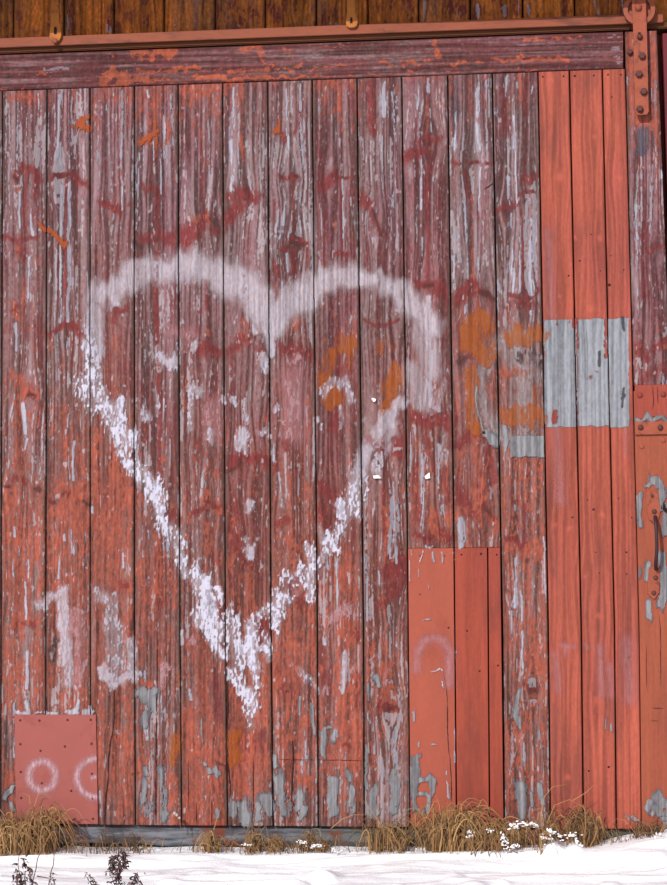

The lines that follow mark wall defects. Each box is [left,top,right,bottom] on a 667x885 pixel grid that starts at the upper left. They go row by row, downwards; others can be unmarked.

peeling [451,78,498,153]
peeling [59,181,72,323]
peeling [497,115,536,313]
peeling [10,395,29,450]
peeling [409,432,443,581]
peeling [636,475,667,538]
peeling [508,557,524,673]
peeling [638,550,667,623]
peeling [13,650,95,724]
peeling [214,754,315,830]
peeling [326,727,450,822]
peeling [511,688,545,822]